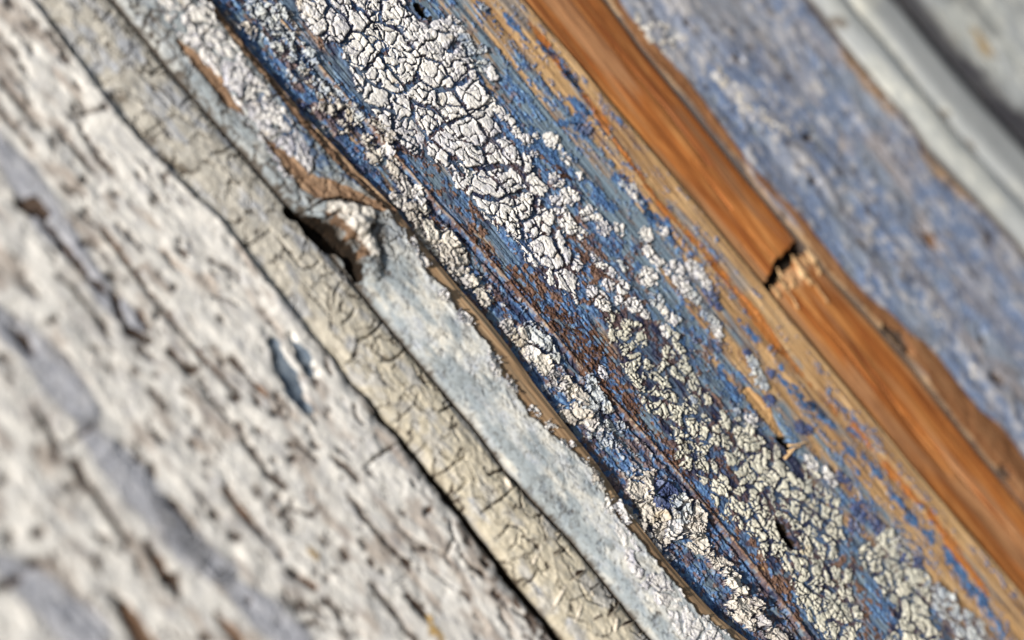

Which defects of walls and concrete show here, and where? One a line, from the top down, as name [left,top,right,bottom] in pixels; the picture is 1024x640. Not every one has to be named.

peeling [157,0,624,309]
peeling [618,173,644,205]
peeling [84,217,240,423]
crack [101,0,649,640]
crack [763,250,804,291]
peeling [339,462,359,483]
peeling [498,318,638,456]
peeling [579,225,989,640]
peeling [354,505,427,569]
peeling [289,569,351,639]
peeling [359,539,417,640]
peeling [404,592,429,622]